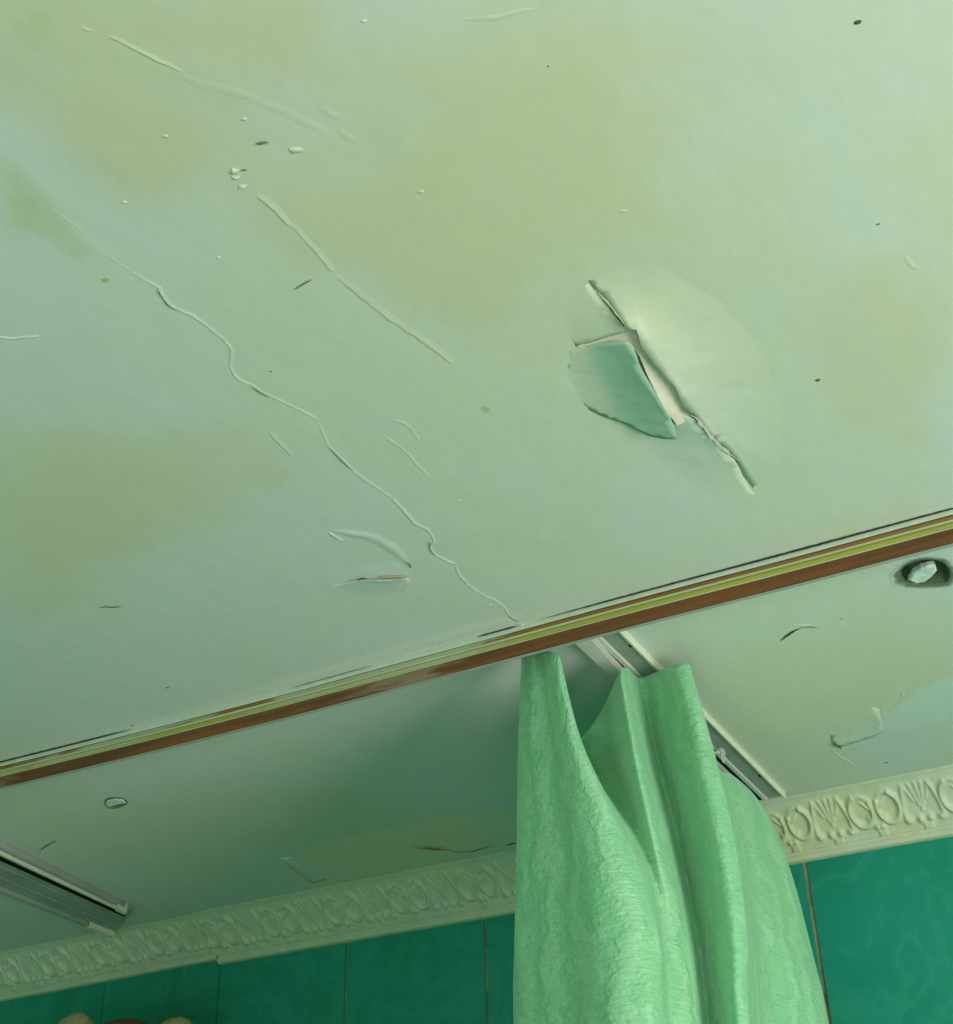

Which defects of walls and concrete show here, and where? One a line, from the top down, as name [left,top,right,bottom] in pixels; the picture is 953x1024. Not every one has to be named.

crack [52,208,953,637]
flaking render [564,265,786,495]
crack [0,730,128,763]
crack [780,623,816,642]